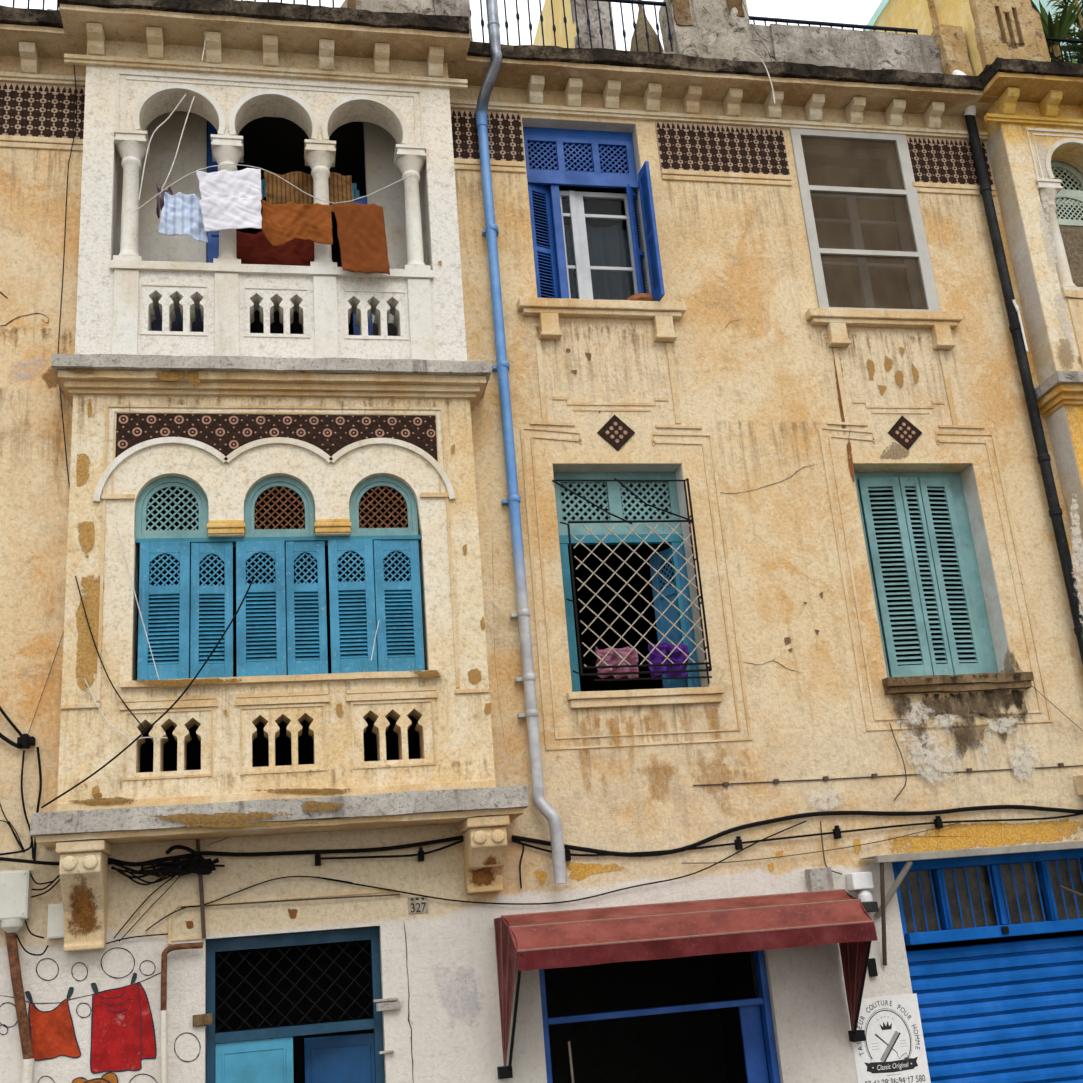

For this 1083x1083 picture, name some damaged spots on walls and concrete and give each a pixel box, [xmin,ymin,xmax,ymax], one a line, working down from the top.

peeling [78,521,95,558]
peeling [76,575,104,691]
peeling [896,702,962,784]
peeling [971,711,1040,788]
peeling [804,787,841,810]